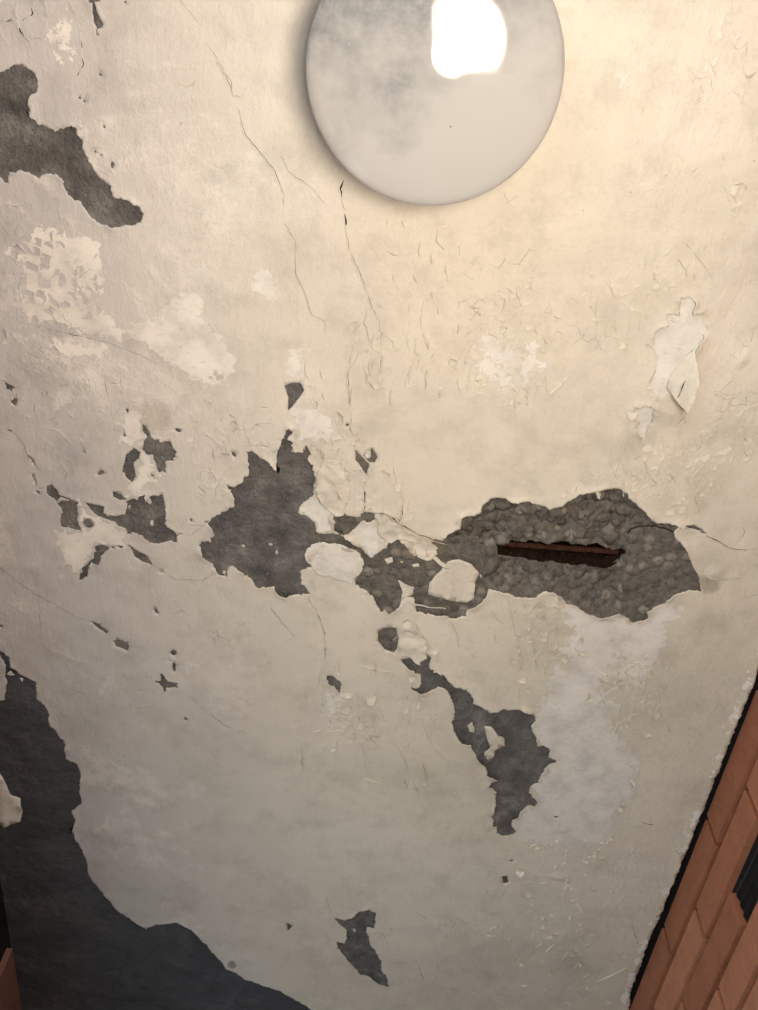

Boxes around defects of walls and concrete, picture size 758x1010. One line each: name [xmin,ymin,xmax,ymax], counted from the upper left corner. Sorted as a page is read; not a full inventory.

peeling [45,7,76,64]
peeling [89,0,103,36]
peeling [0,64,241,387]
crack [177,0,382,449]
peeling [468,334,551,399]
peeling [635,298,708,438]
peeling [37,396,183,580]
peeling [92,622,129,651]
spalling [199,346,706,852]
peeling [0,650,311,1010]
peeling [335,910,389,986]